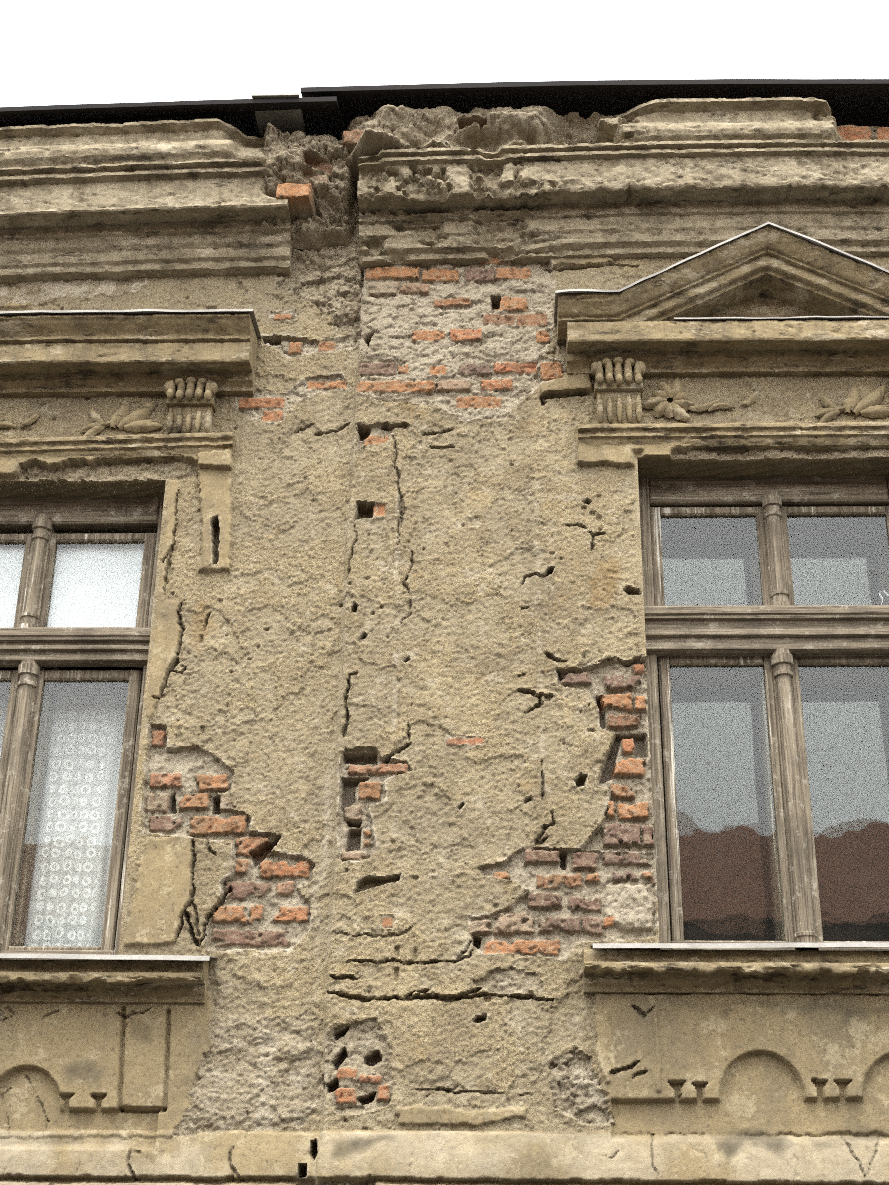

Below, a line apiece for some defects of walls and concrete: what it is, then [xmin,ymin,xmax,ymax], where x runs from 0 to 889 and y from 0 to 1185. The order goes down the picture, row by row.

flaking render [234,104,618,425]
crack [293,419,353,436]
flaking render [353,419,397,451]
crack [346,525,358,579]
crack [380,419,455,627]
crack [174,838,233,950]
flaking render [138,719,318,955]
crack [340,670,358,739]
flaking render [334,743,414,897]
crack [382,723,414,764]
flaking render [466,655,659,997]
flaking render [172,1009,398,1185]